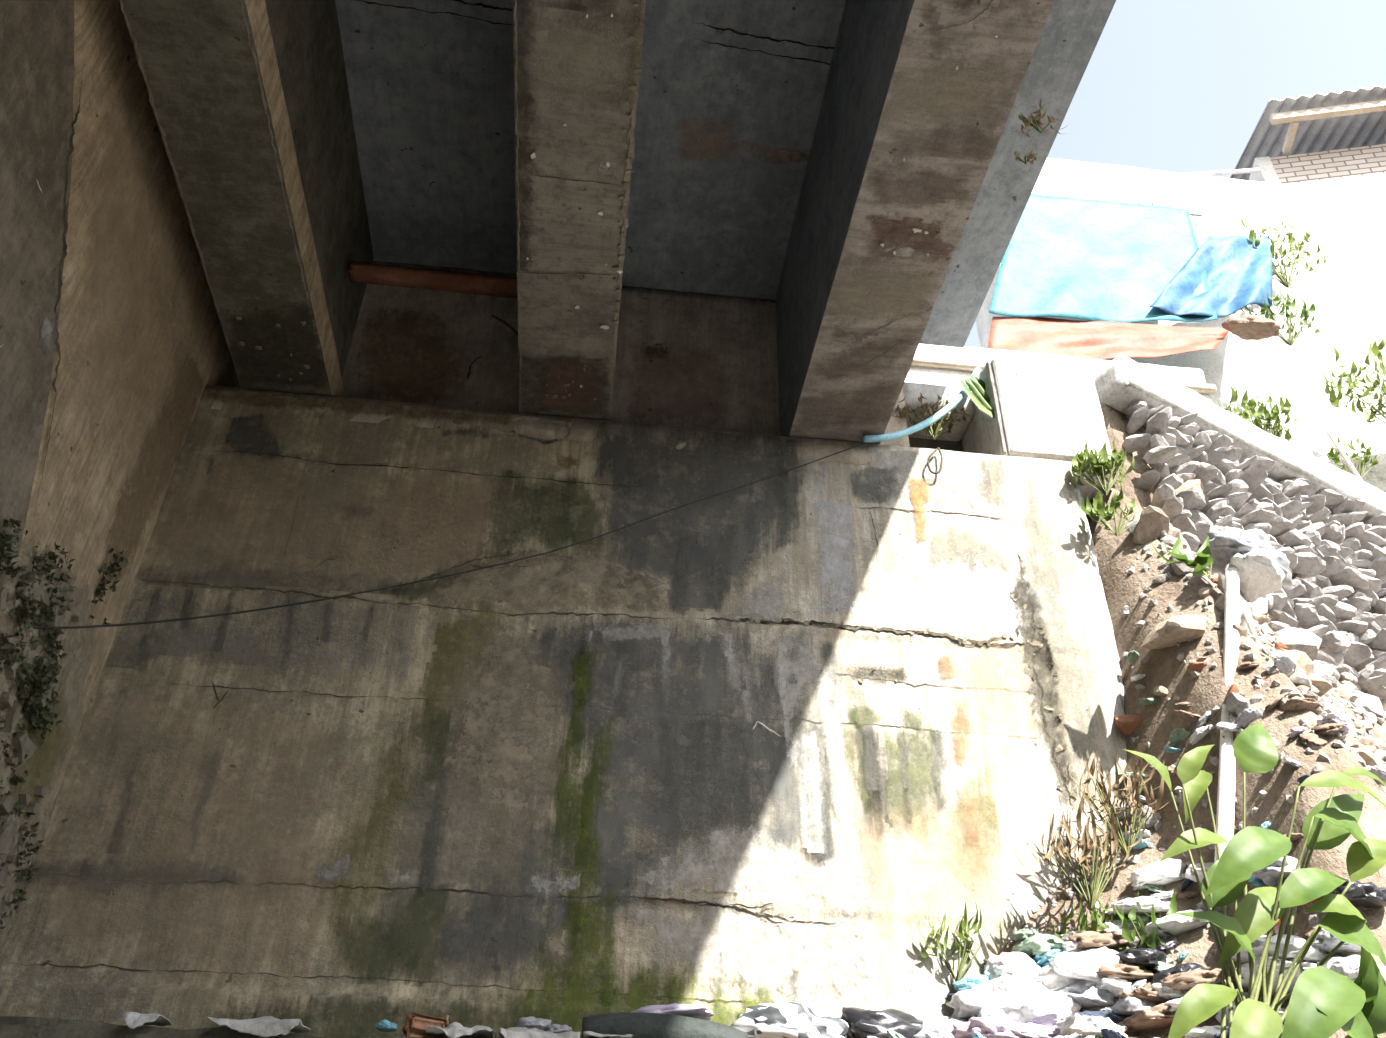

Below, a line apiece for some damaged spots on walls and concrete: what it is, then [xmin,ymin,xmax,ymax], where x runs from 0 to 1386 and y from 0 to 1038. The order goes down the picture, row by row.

crack [357,0,513,26]
crack [697,23,834,65]
corrosion [909,478,929,541]
crack [123,494,1075,809]
leakage [378,357,881,1008]
leakage [816,447,1098,800]
crack [35,873,594,898]
crack [630,896,863,925]